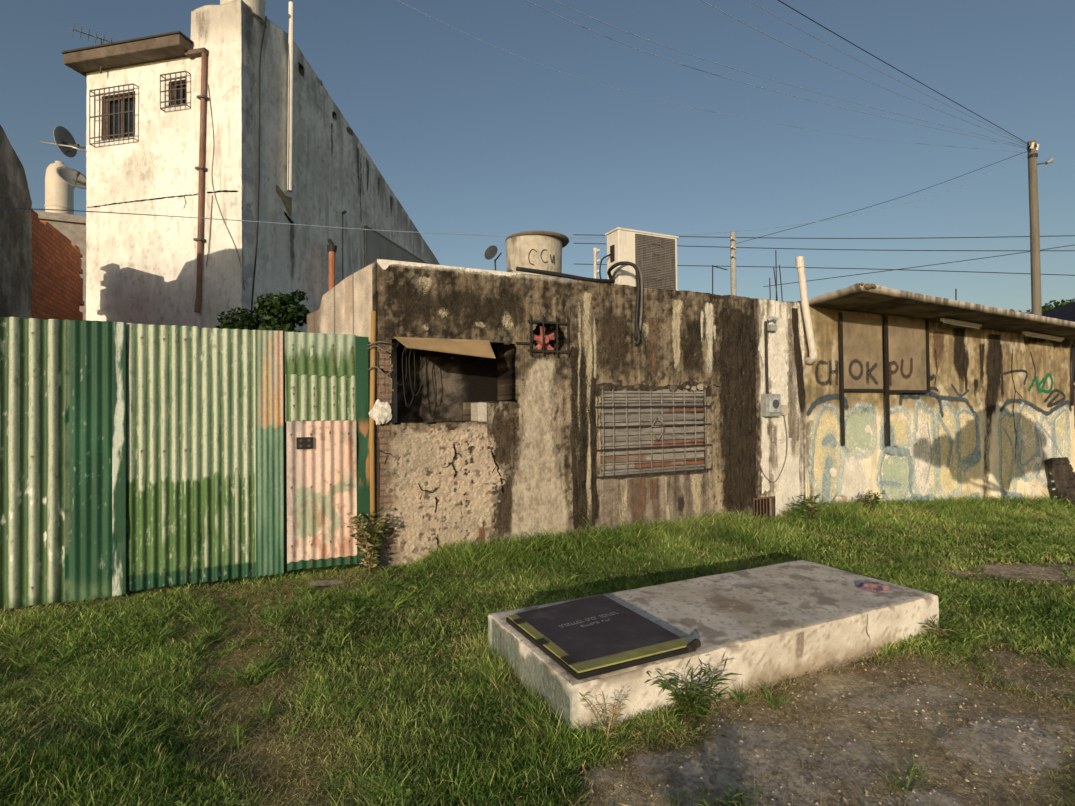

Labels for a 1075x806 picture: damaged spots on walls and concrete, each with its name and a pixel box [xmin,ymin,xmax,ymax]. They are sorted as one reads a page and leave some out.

damp [357,147,393,212]
damp [397,277,524,329]
crack [418,442,462,552]
spalling [382,422,512,567]
crack [491,450,507,492]
damp [487,414,516,535]
damp [570,292,628,530]
damp [664,474,703,522]
damp [671,300,777,513]
damp [788,308,818,503]
damp [952,328,1004,498]